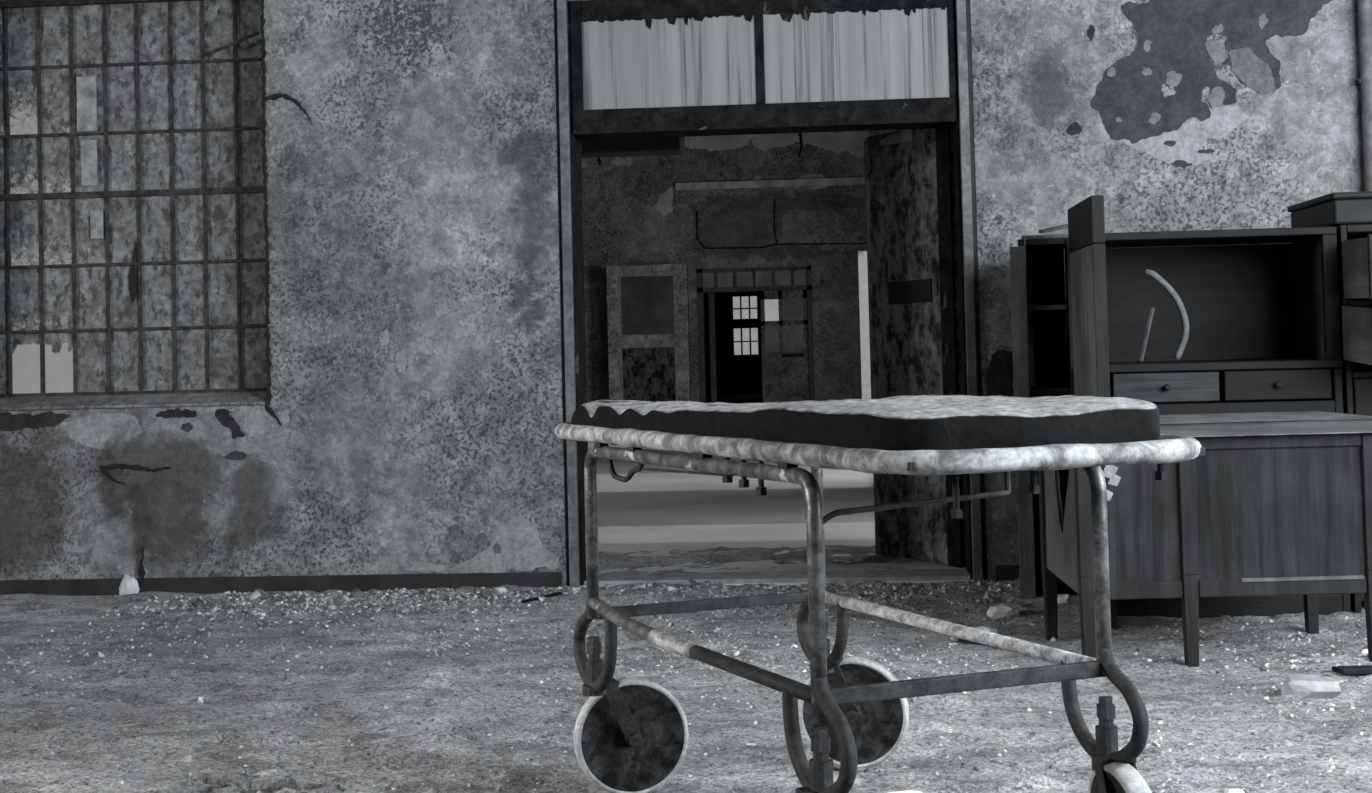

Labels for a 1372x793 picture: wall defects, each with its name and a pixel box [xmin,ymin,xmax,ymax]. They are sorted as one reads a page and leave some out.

peeling [1091,0,1332,169]
spalling [1067,122,1082,135]
peeling [0,411,143,457]
spalling [156,408,197,432]
peeling [215,409,290,460]
water stain [97,441,211,568]